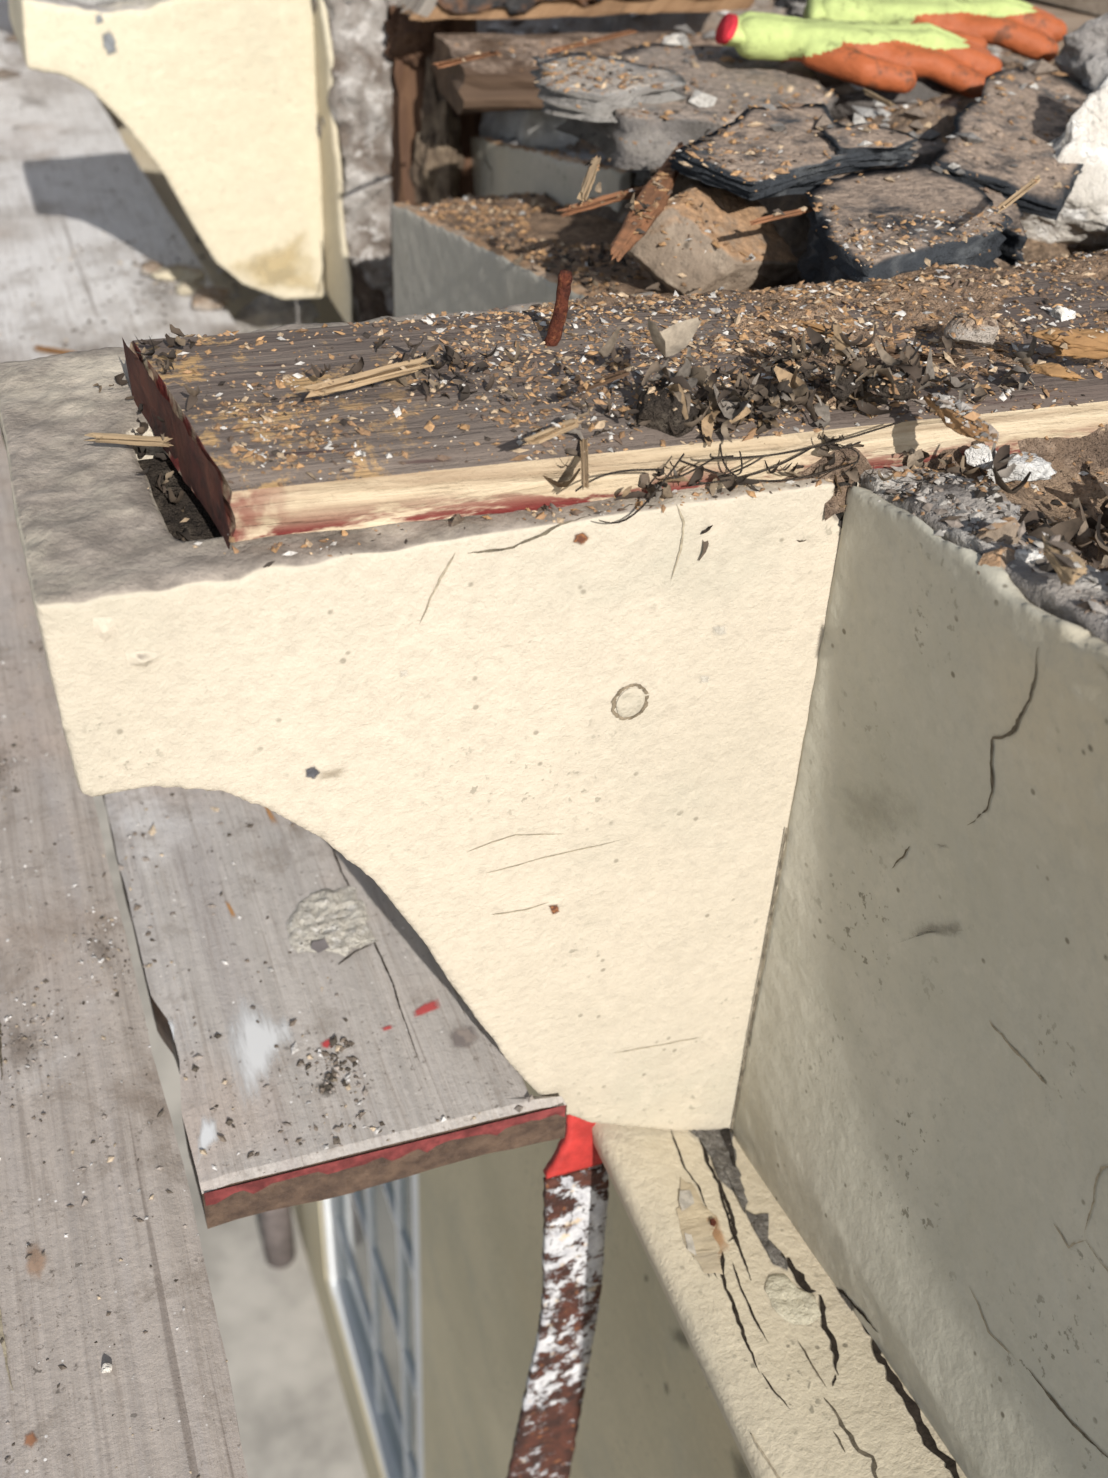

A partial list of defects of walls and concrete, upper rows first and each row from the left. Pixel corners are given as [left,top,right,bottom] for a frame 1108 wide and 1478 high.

peeling [96,14,116,55]
crack [968,648,1038,825]
crack [671,828,960,1478]
crack [1053,1166,1108,1272]
crack [970,1289,1108,1458]